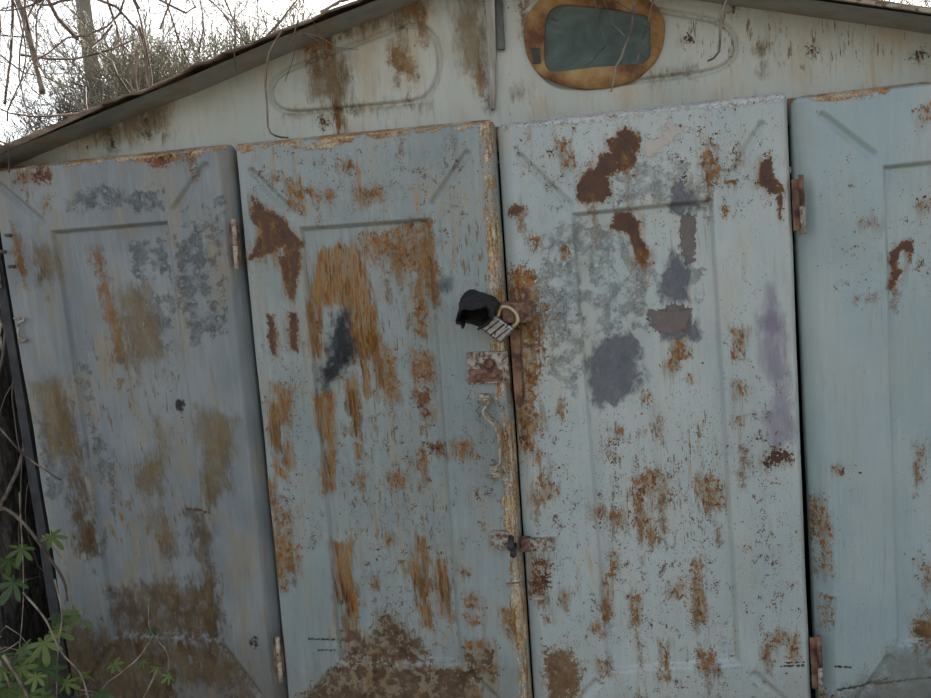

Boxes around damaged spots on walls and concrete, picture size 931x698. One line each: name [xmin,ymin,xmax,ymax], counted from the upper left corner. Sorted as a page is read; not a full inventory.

rust [681,6,792,67]
rust [800,20,857,69]
rust [804,81,931,113]
peeling [67,185,164,213]
rust [513,120,616,210]
rust [636,114,778,220]
peeling [125,196,230,351]
peeling [534,125,706,396]
rust [0,30,588,698]
rust [539,320,803,698]
rust [808,493,836,578]
rust [904,549,931,666]